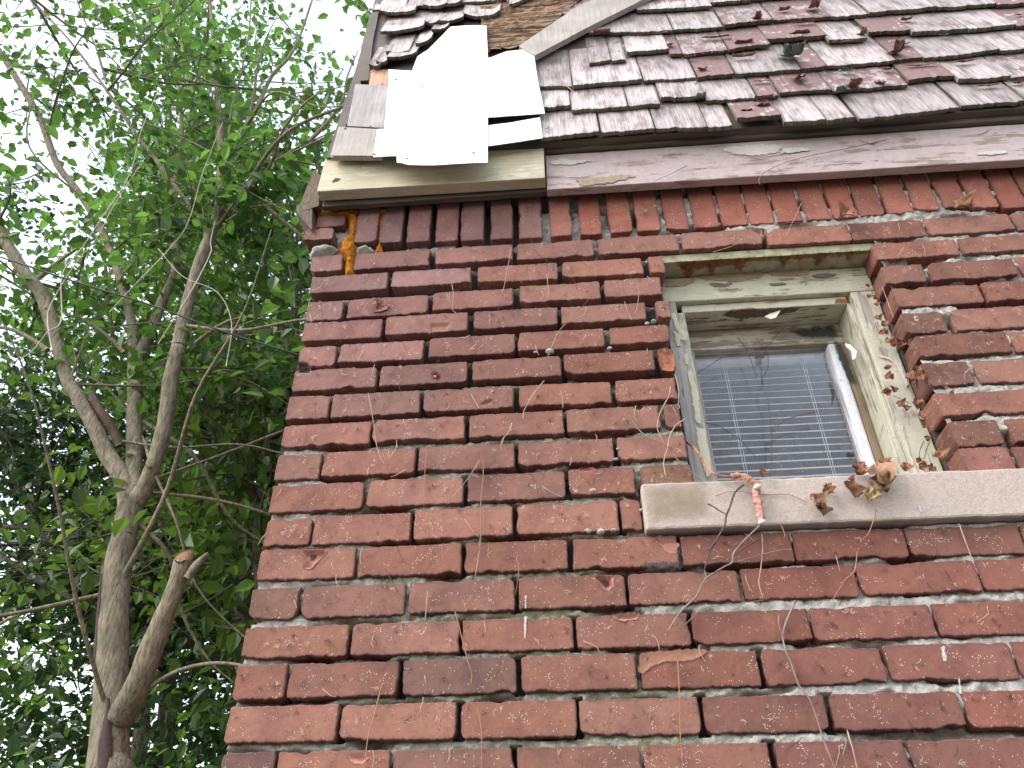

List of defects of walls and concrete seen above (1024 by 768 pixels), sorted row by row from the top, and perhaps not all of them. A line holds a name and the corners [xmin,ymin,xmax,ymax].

peeling [723,144,810,156]
corrosion [677,250,870,278]
peeling [700,307,807,327]
spalling [587,574,614,591]
spalling [638,649,707,674]